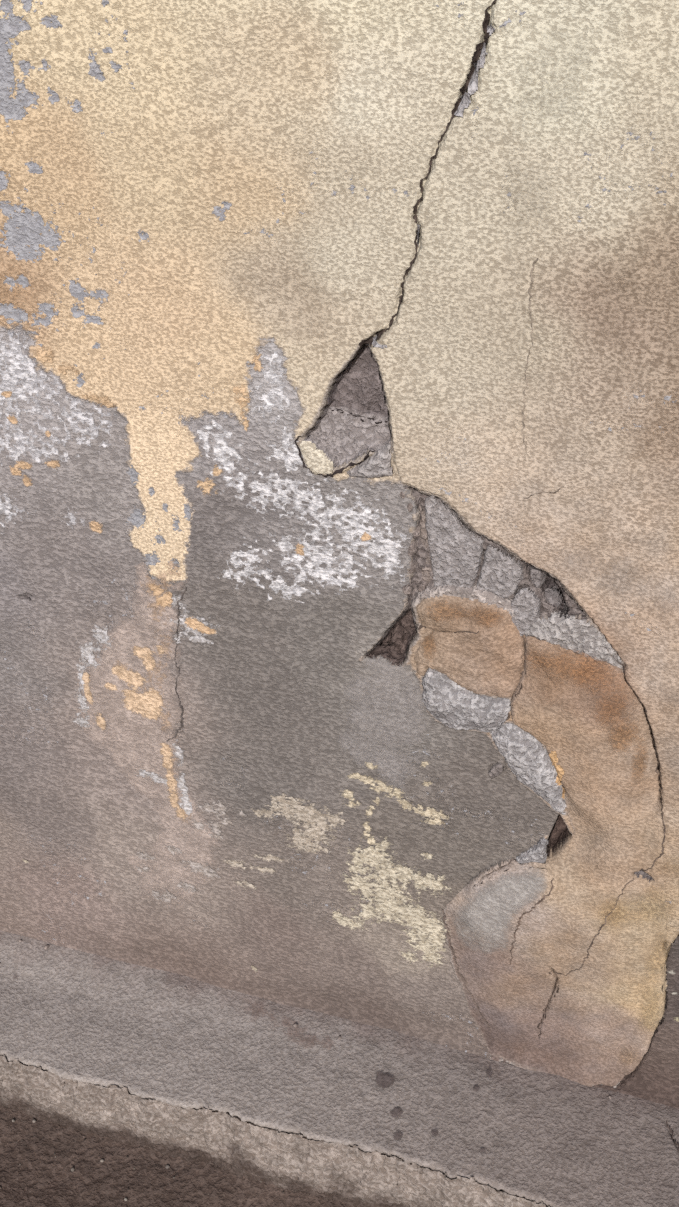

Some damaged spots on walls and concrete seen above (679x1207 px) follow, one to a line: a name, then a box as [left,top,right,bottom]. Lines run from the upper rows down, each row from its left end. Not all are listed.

peeling [0,0,83,134]
peeling [88,0,134,89]
peeling [25,158,43,174]
crack [359,0,496,349]
damp [0,333,113,466]
damp [0,493,25,528]
damp [197,351,407,603]
peeling [0,170,622,1067]
crack [537,647,666,1039]
crack [474,859,554,965]
spalling [594,923,679,1109]
crack [666,1122,679,1151]